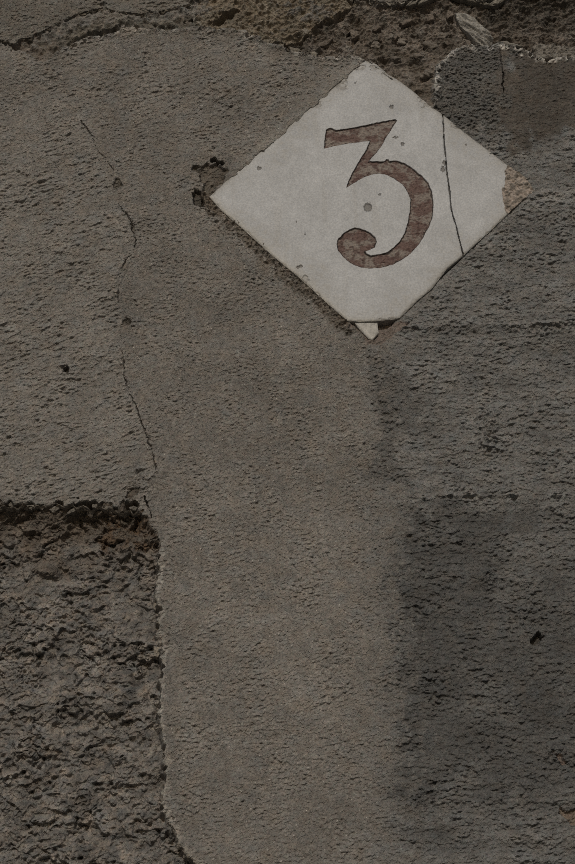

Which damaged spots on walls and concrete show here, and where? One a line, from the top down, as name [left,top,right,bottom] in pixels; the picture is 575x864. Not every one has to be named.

crack [81,119,157,469]
spalling [71,0,575,107]
crack [443,116,464,257]
spalling [0,497,196,864]